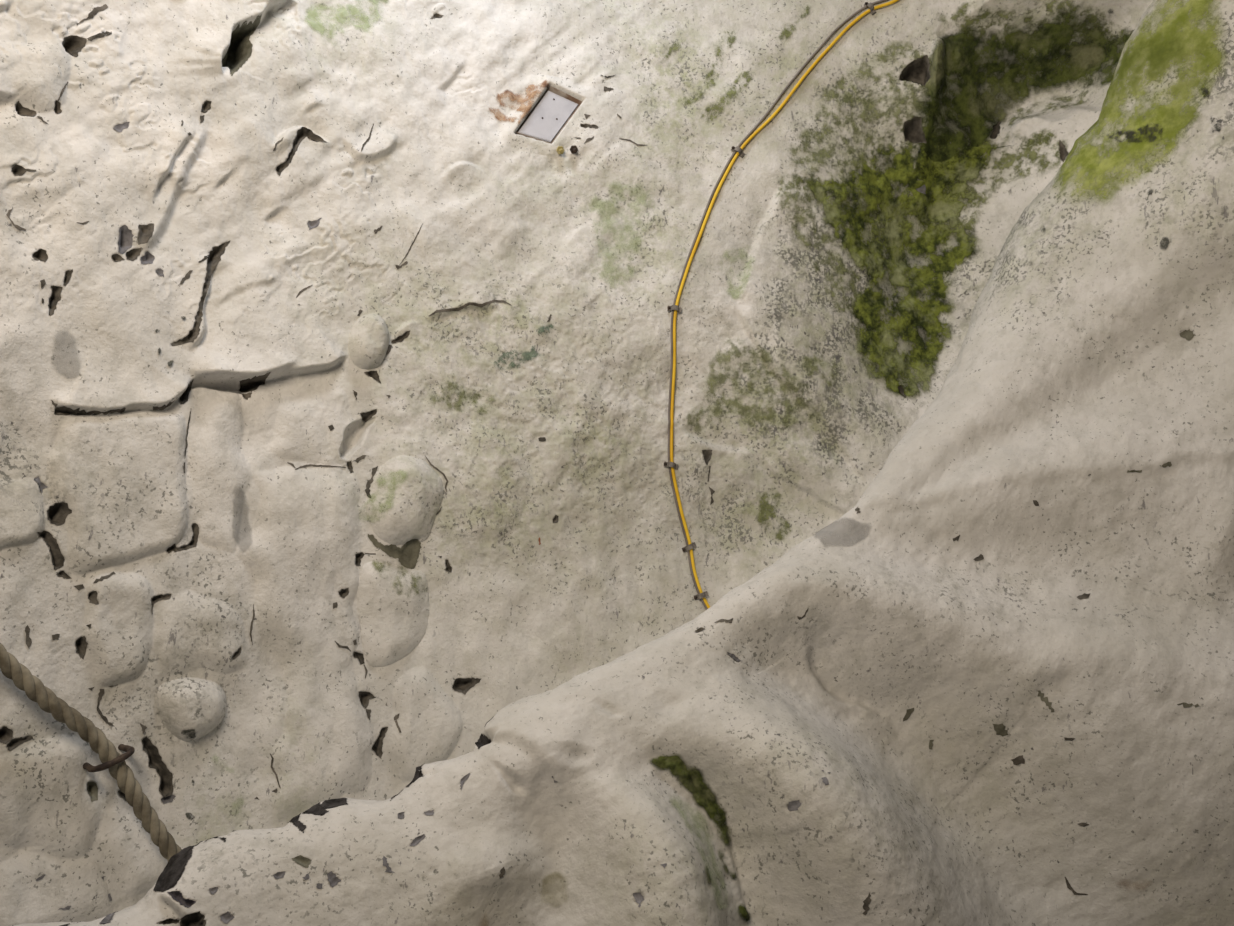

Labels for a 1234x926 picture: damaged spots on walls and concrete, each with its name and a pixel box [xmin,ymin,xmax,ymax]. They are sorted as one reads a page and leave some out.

corrosion [489,80,549,123]
damp [1109,124,1162,143]
spalling [153,836,226,892]